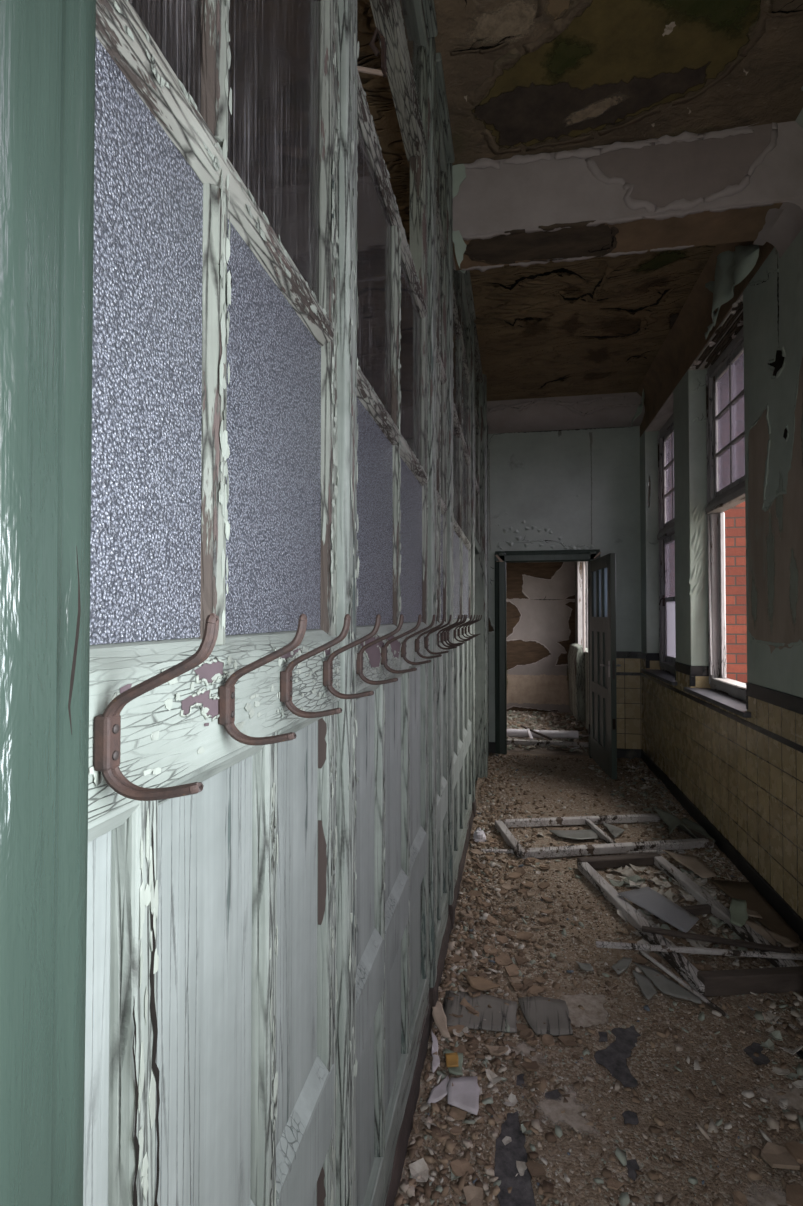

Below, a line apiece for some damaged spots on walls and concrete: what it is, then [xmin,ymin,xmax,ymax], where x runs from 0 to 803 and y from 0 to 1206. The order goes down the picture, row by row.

peeling [111,0,784,823]
peeling [747,346,803,653]
peeling [88,766,104,786]
crack [132,801,160,1206]
peeling [138,809,159,1200]
peeling [270,989,278,1206]
peeling [317,1074,355,1206]
peeling [318,820,358,1098]